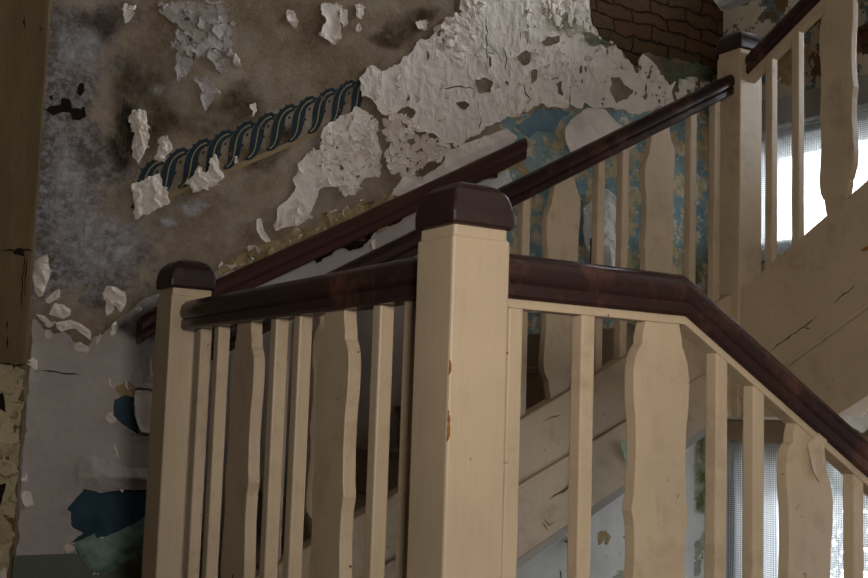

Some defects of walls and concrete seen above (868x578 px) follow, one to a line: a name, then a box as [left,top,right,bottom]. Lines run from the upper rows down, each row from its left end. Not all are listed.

peeling [158,0,241,111]
peeling [214,0,725,288]
peeling [0,254,160,578]
peeling [201,360,213,534]
peeling [220,349,235,533]
peeling [259,330,271,488]
peeling [284,319,294,488]
peeling [356,309,373,446]
peeling [389,305,405,447]
flaking render [840,415,868,433]